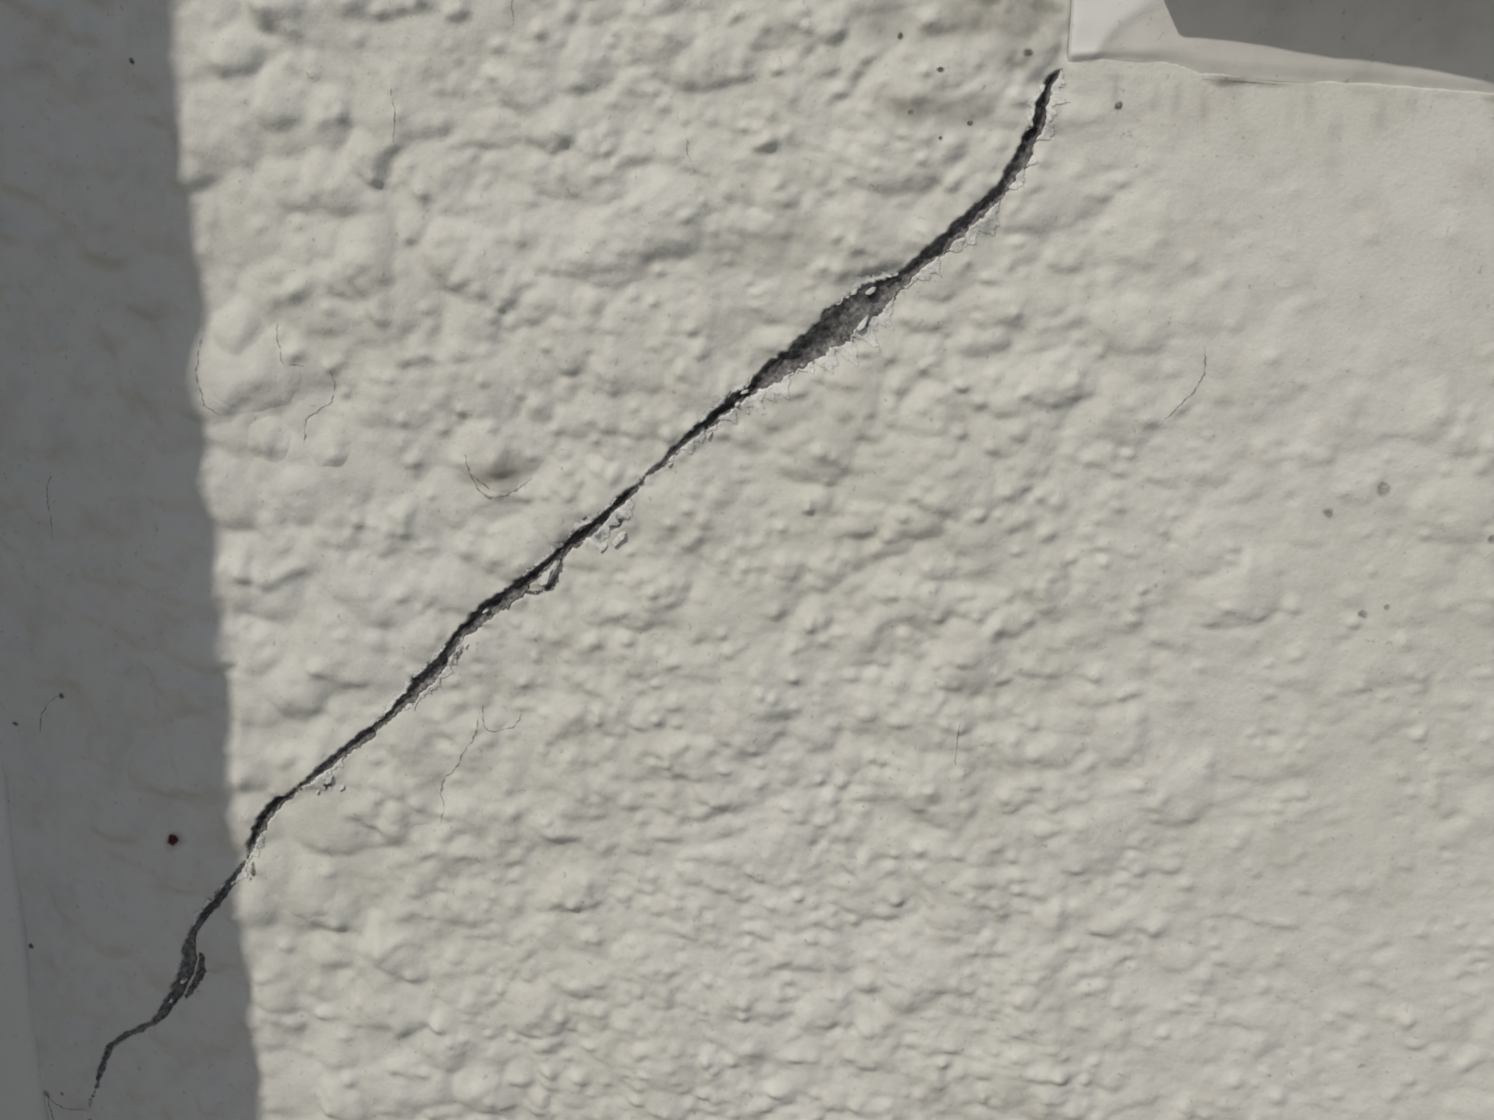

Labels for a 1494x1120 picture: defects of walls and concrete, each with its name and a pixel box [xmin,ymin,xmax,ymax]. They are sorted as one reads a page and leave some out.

crack [47,69,1071,1120]